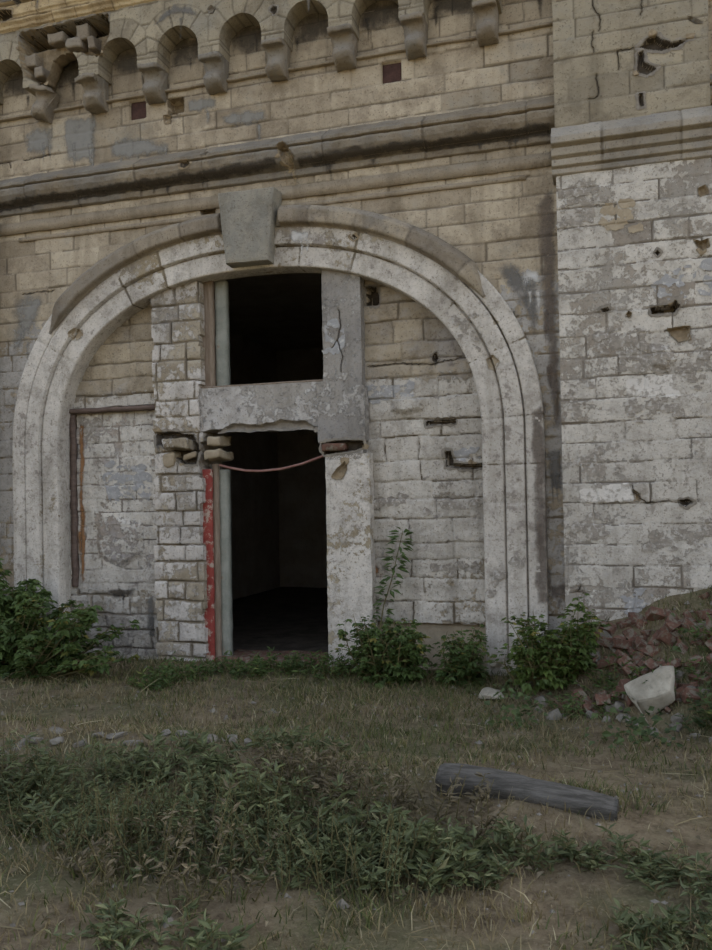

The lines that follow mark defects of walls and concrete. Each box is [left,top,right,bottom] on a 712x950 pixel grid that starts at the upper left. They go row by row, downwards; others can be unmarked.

spalling [16,11,111,89]
crack [588,47,634,99]
spalling [633,16,704,78]
peeling [648,238,712,342]
leakage [503,194,565,606]
peeling [592,311,712,423]